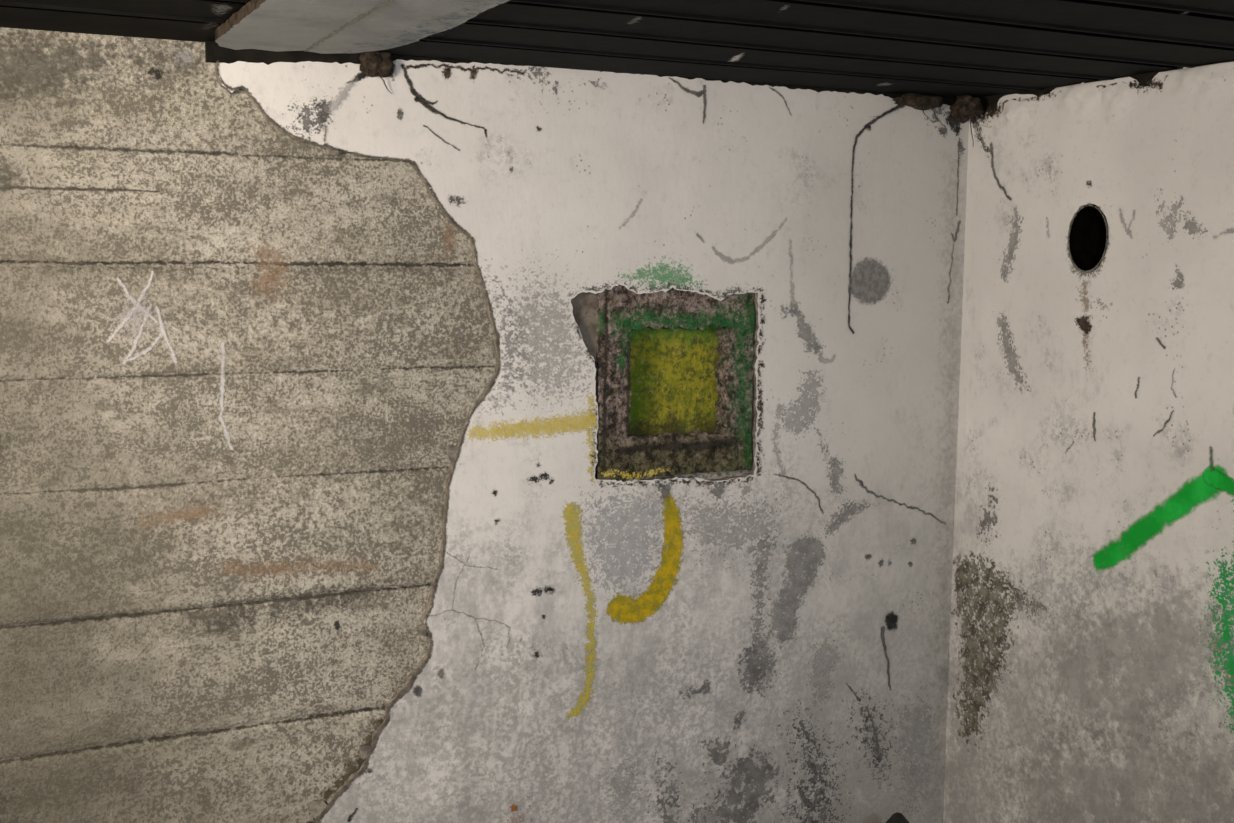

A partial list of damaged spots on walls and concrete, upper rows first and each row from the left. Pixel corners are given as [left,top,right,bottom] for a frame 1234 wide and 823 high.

spalling [344,0,558,95]
crack [401,64,487,151]
crack [697,224,783,263]
crack [848,105,905,334]
spalling [0,4,501,823]
crack [774,474,823,513]
crack [855,474,946,524]
leakage [951,482,1051,747]